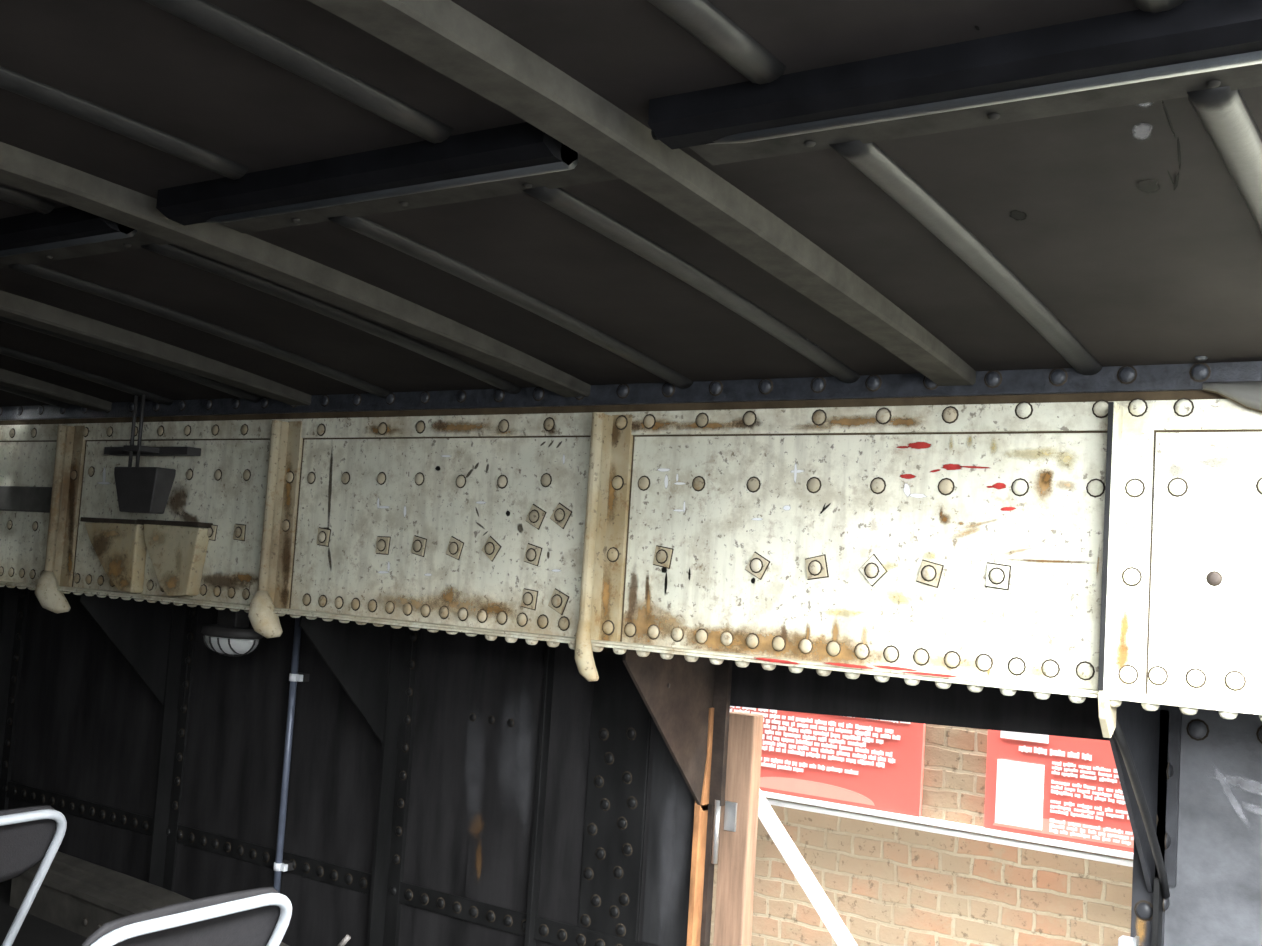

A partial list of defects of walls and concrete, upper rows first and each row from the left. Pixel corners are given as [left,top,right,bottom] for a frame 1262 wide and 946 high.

corrosion [608,467,616,518]
corrosion [1037,472,1072,496]
corrosion [91,531,130,588]
corrosion [201,574,258,589]
corrosion [389,587,511,615]
corrosion [602,574,881,664]
corrosion [1115,606,1129,675]